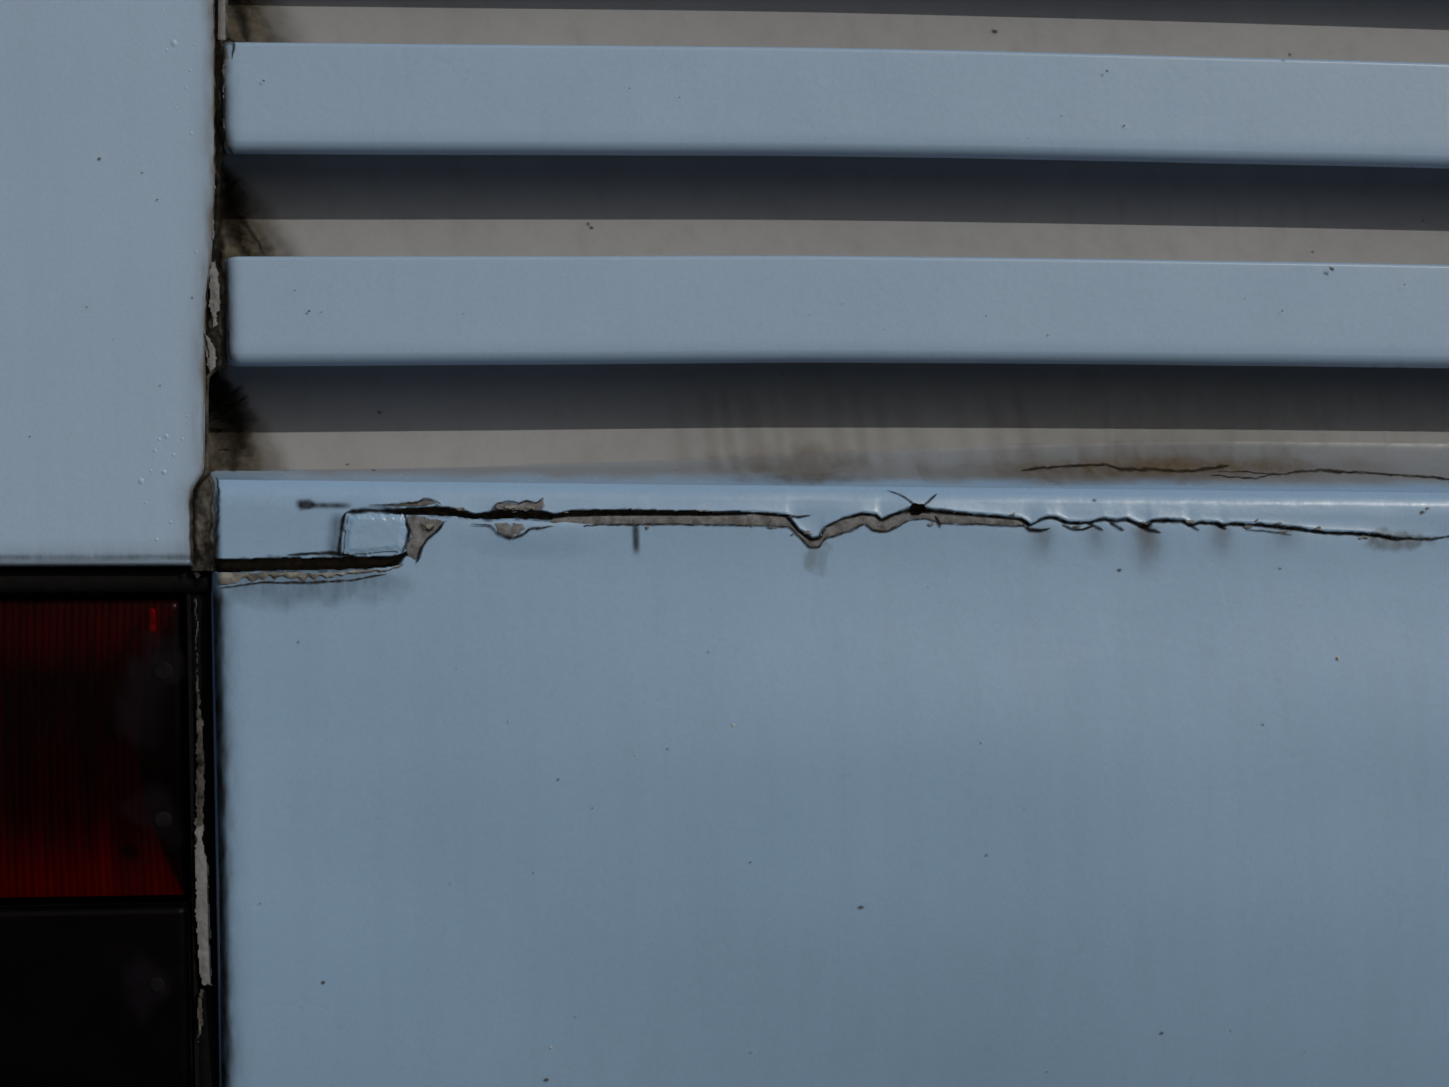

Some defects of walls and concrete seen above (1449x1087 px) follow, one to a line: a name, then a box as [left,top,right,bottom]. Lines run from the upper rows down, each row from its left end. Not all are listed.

crack [1021,463,1449,480]
spalling [344,498,446,562]
peeling [474,498,552,539]
crack [191,472,1449,588]
peeling [194,598,212,1042]